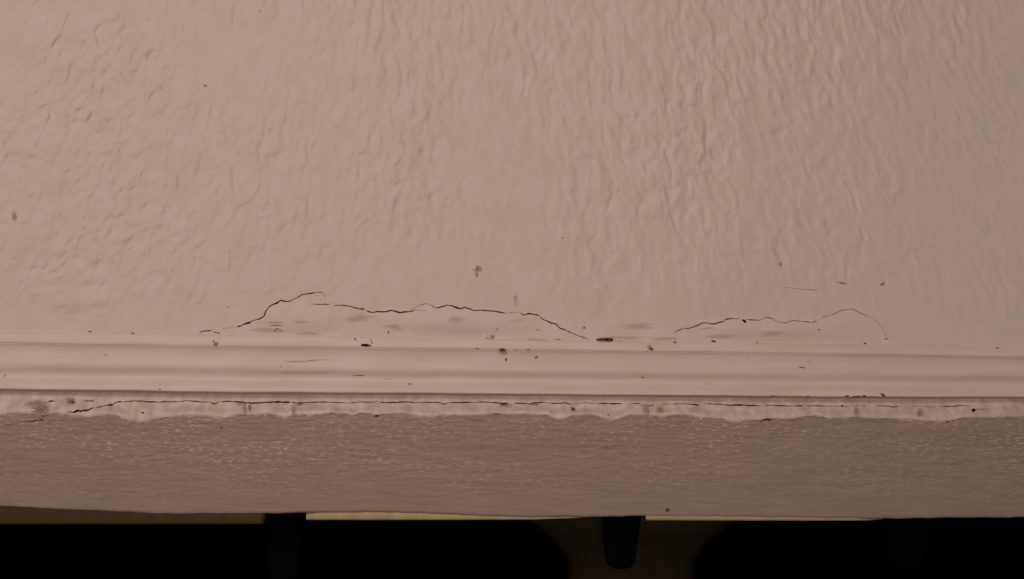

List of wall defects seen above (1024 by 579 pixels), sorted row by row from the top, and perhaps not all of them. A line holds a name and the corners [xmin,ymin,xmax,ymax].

crack [200,292,587,339]
crack [674,309,887,340]